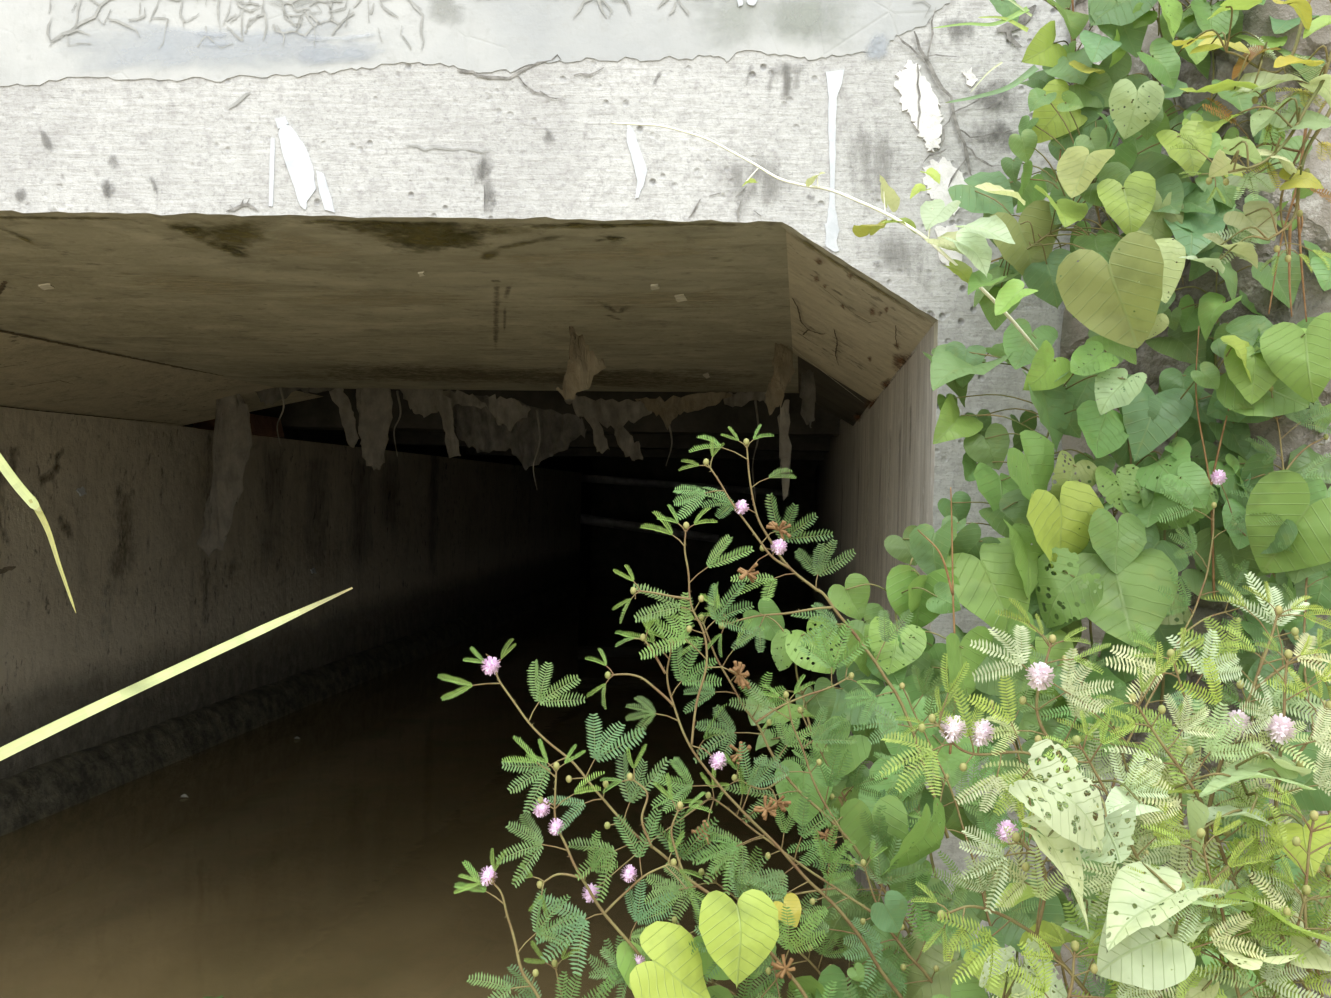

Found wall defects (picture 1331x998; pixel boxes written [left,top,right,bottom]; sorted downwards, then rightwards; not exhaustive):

crack [46,0,424,49]
spalling [962,67,978,87]
peeling [269,116,288,207]
peeling [316,170,335,213]
spalling [894,60,968,275]
peeling [825,218,839,252]
crack [0,281,8,294]
crack [792,286,897,400]
crack [0,330,223,426]